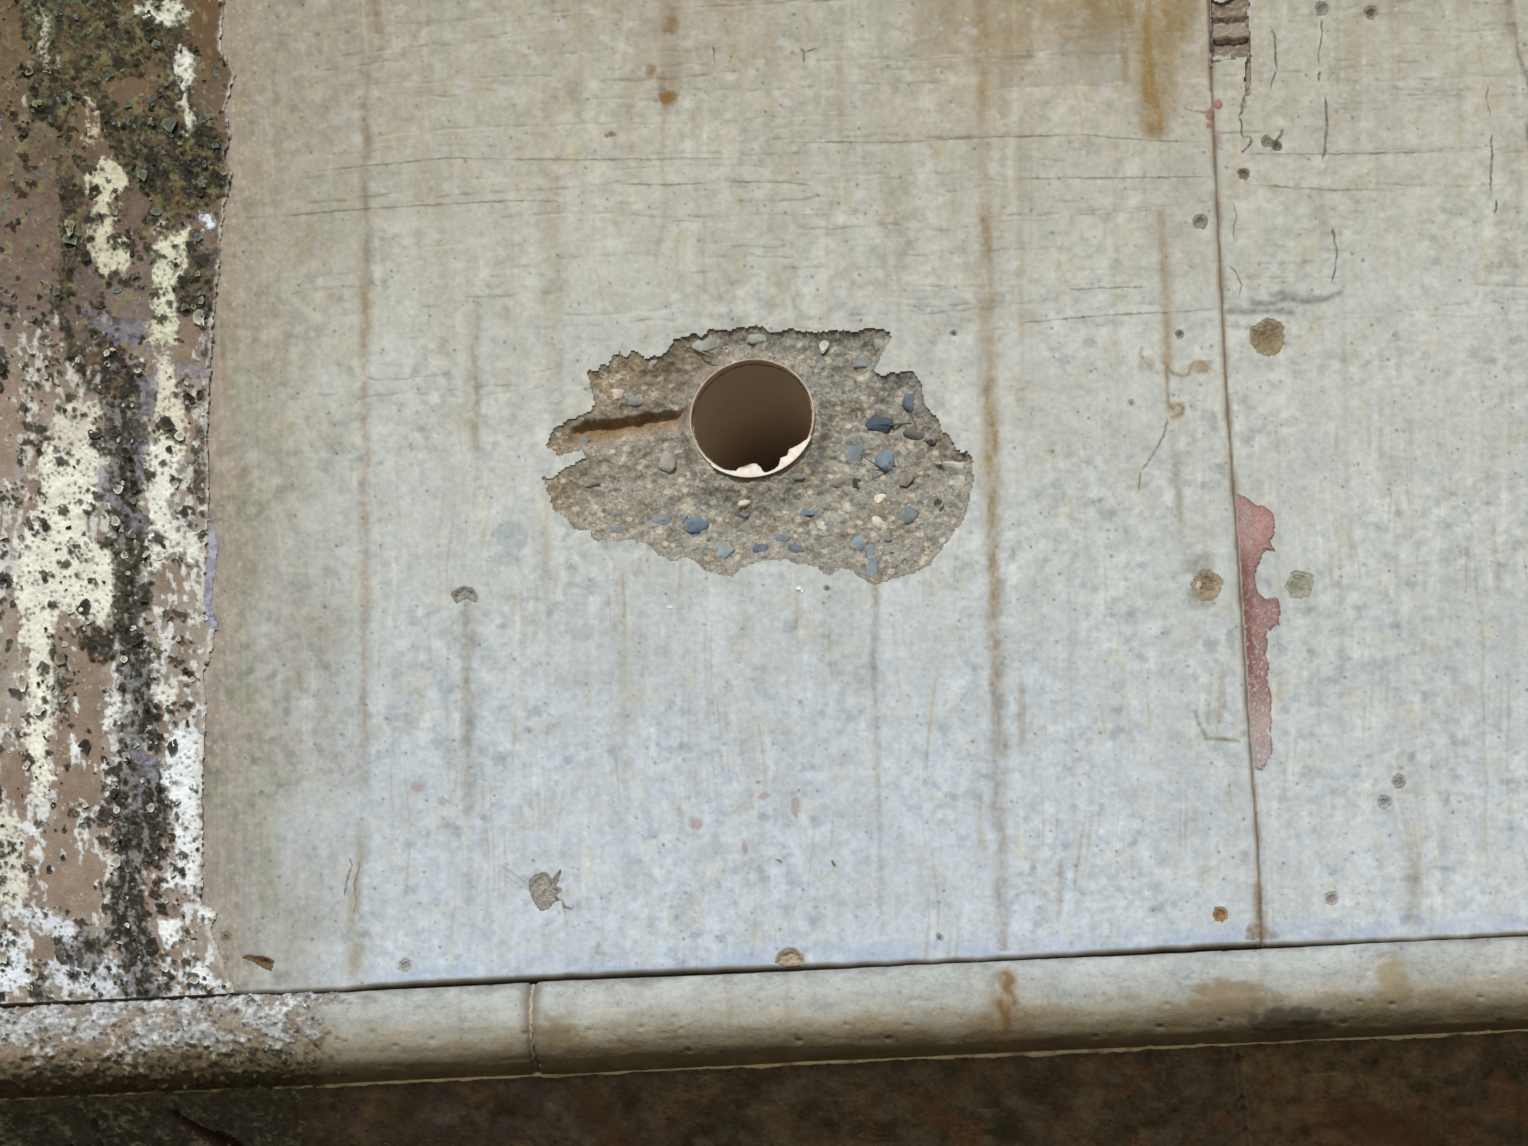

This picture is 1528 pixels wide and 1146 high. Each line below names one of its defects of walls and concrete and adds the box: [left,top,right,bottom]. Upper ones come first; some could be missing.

rust [659,90,677,103]
rust [1083,0,1190,134]
spalling [1208,0,1252,94]
spalling [542,324,974,586]
peeling [1237,494,1281,769]
peeling [529,870,562,911]